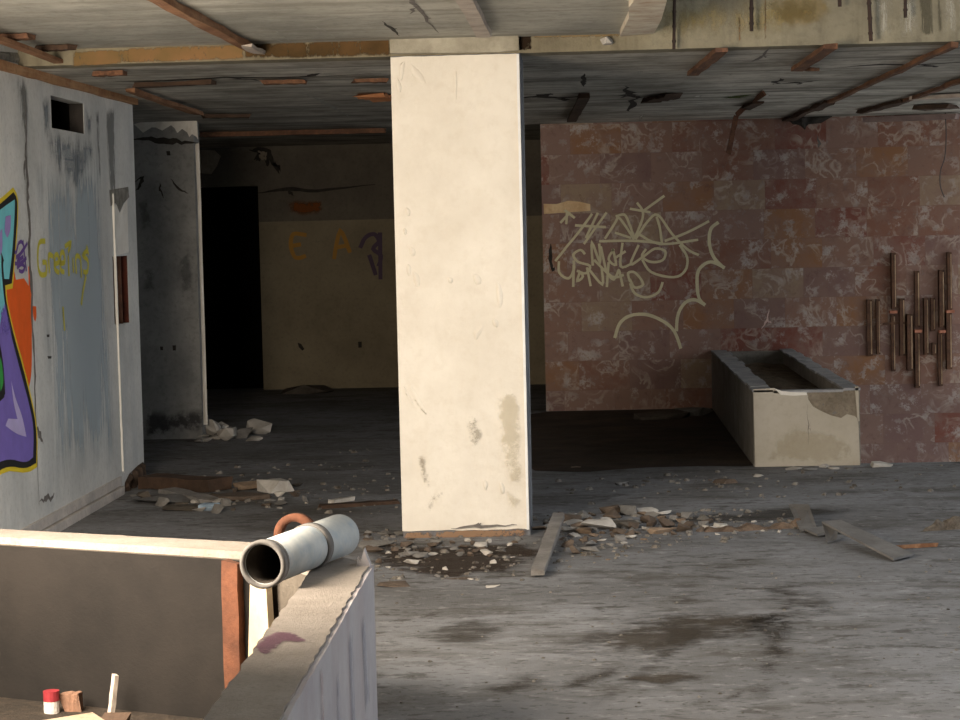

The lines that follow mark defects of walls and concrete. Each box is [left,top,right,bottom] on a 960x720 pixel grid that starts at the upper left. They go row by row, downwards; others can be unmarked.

crack [382,0,439,35]
peeling [134,121,221,425]
spalling [776,389,857,418]